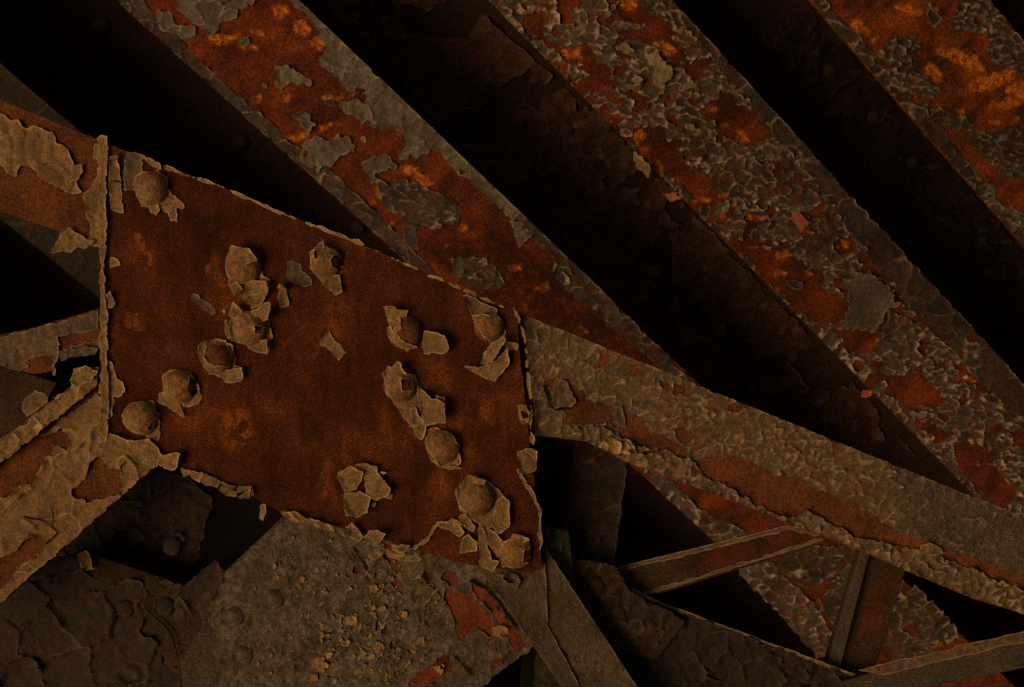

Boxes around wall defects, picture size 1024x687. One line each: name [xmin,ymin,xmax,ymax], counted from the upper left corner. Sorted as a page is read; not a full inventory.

rust [209,30,264,49]
rust [294,20,324,50]
rust [653,41,676,56]
rust [925,48,1024,120]
peeling [0,113,83,194]
peeling [116,0,463,282]
rust [403,166,431,187]
rust [431,225,655,365]
peeling [208,0,1024,687]
peeling [0,135,254,687]